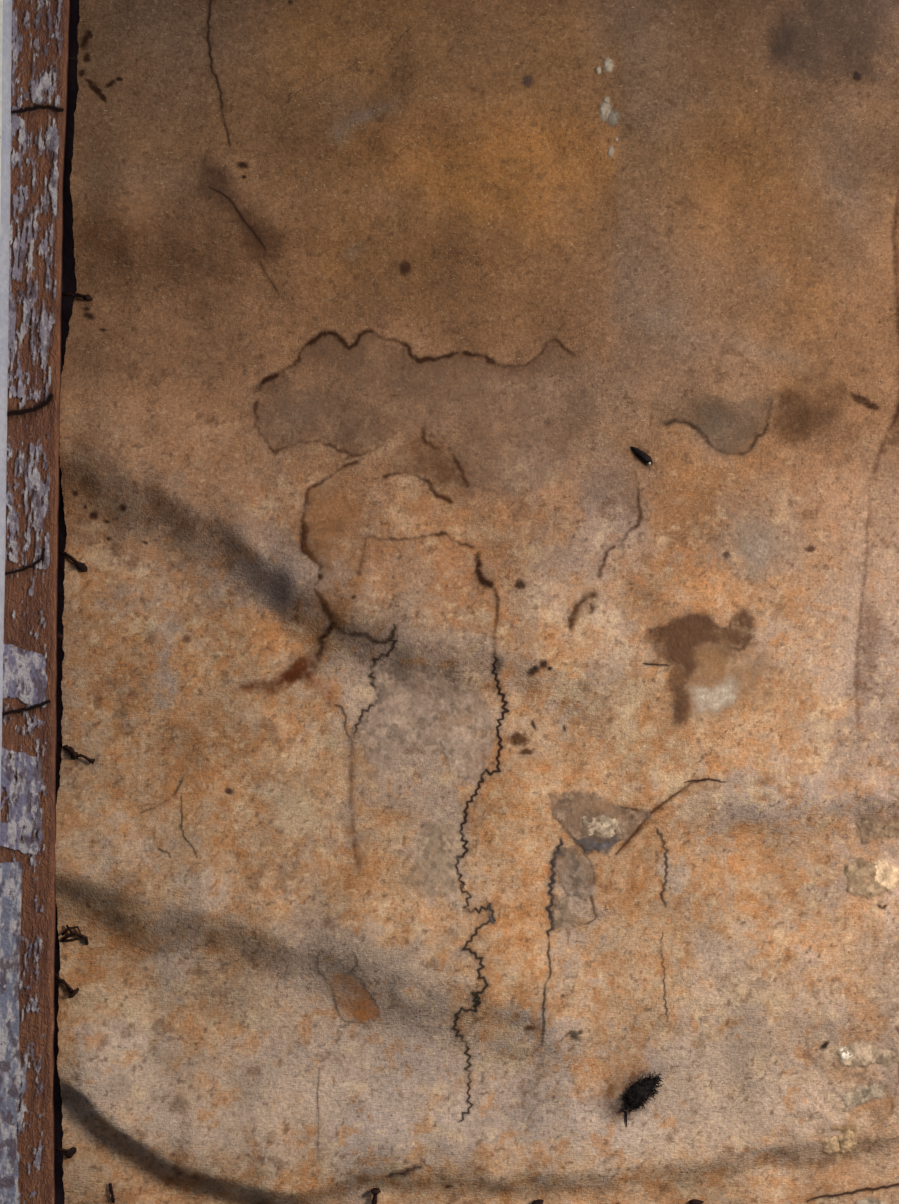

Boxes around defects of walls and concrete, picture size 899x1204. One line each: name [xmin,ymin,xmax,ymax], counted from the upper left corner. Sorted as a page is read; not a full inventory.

crack [207,0,231,145]
crack [211,187,277,289]
damp [666,407,768,454]
rust [247,657,314,693]
damp [653,612,767,723]
crack [452,656,509,1122]
peeling [549,791,650,927]
crack [542,778,725,1046]